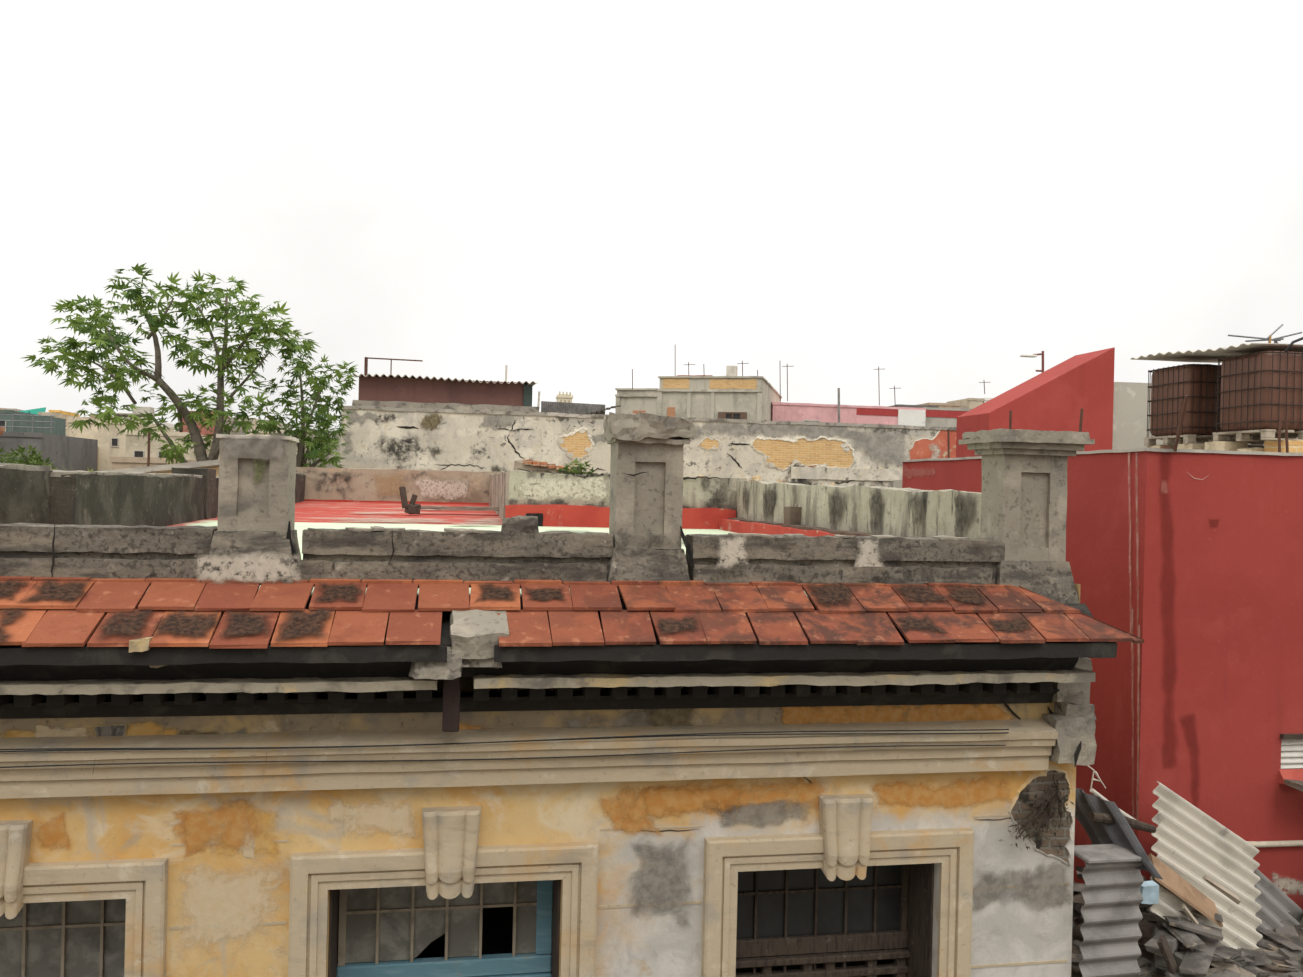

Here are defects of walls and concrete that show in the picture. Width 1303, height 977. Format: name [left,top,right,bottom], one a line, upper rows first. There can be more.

spalling [557,427,595,468]
spalling [749,436,856,472]
peeling [908,429,956,460]
damp [828,493,845,524]
damp [858,481,883,528]
spalling [1008,657,1097,866]